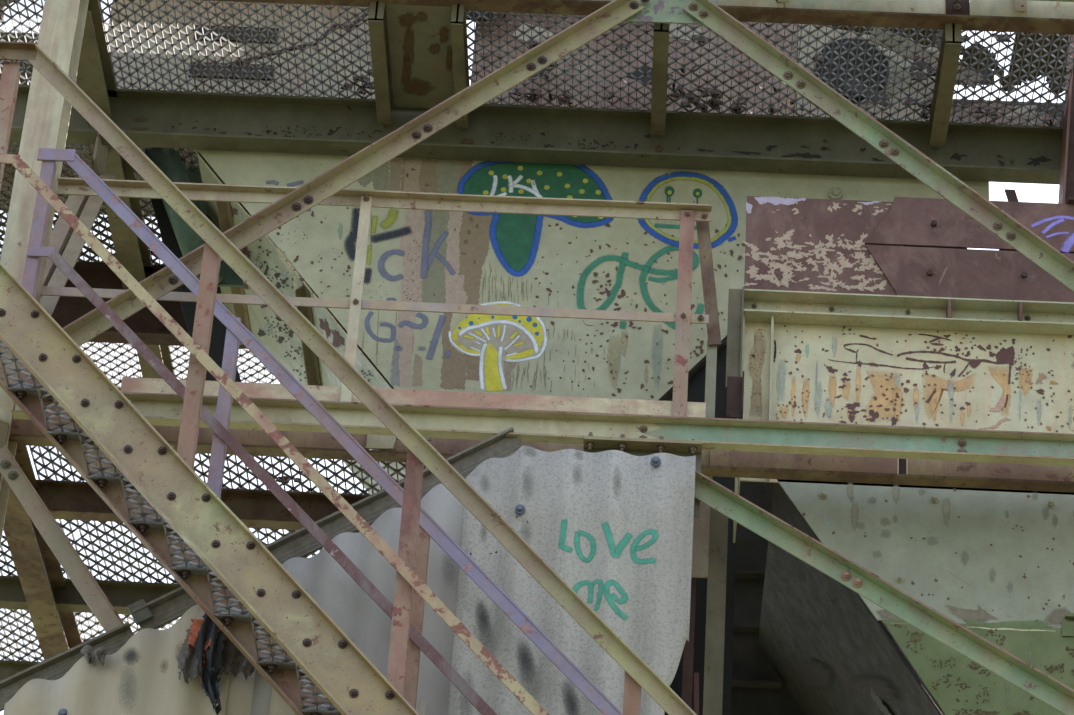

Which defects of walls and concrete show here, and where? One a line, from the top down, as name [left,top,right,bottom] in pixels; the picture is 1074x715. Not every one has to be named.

corrosion [399,12,433,95]
peeling [746,196,806,215]
peeling [828,201,891,215]
corrosion [242,211,351,294]
peeling [741,229,887,292]
corrosion [257,305,306,381]
corrosion [319,318,344,348]
corrosion [879,610,1000,715]